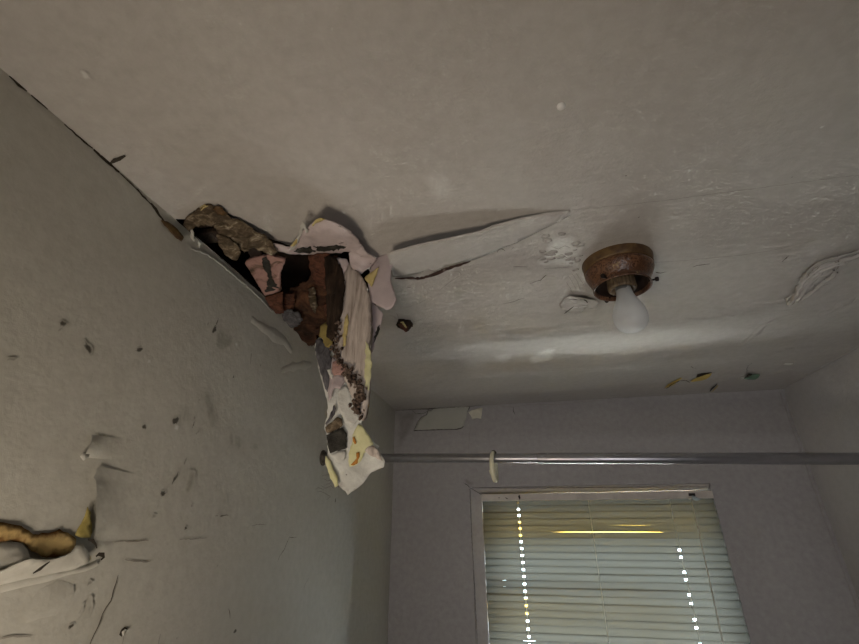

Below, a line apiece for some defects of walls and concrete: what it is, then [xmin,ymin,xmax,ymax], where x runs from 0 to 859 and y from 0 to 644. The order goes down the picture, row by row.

crack [9,76,164,220]
peeling [365,254,413,353]
peeling [524,228,593,293]
peeling [665,372,718,392]